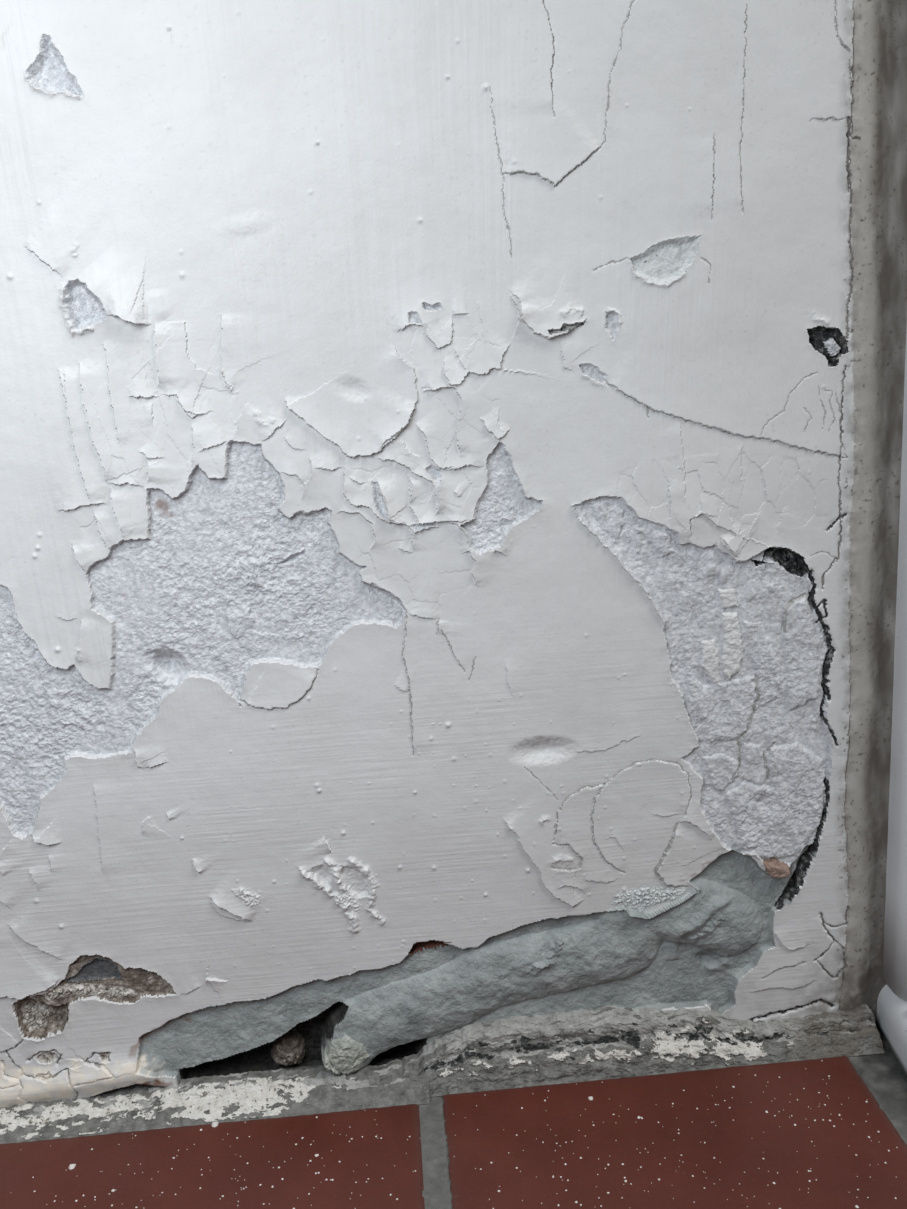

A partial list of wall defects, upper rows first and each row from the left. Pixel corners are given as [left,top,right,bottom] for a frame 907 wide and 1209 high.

flaking render [24,34,84,99]
crack [489,0,635,258]
flaking render [593,235,711,287]
crack [603,0,861,746]
flaking render [807,308,849,367]
peeling [0,285,543,837]
flaking render [136,496,833,1083]
crack [524,759,692,873]
crack [797,778,830,886]
peeling [0,899,232,1040]
crack [747,905,849,1021]
damp [0,1052,168,1108]